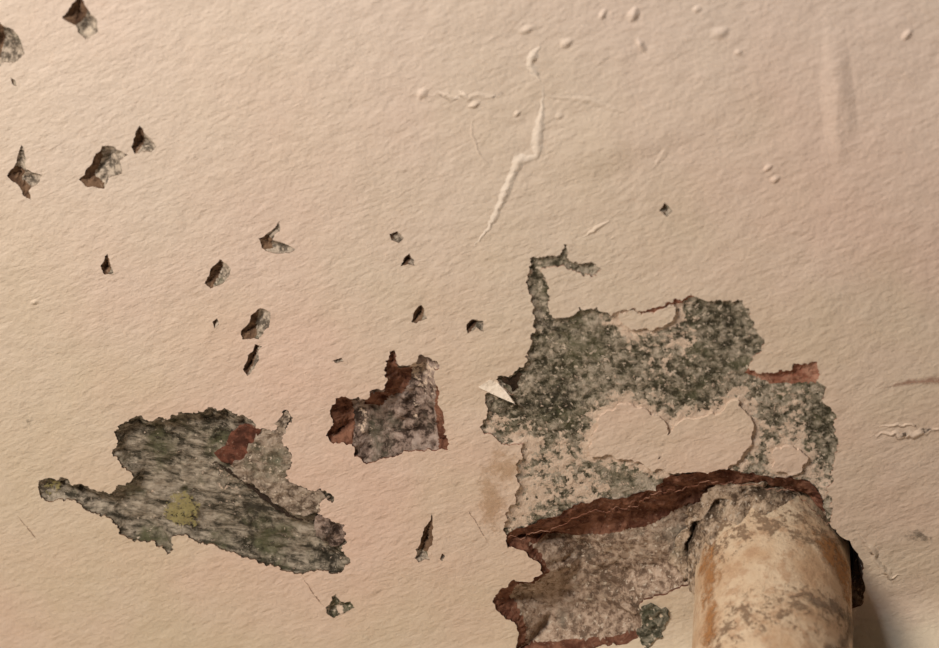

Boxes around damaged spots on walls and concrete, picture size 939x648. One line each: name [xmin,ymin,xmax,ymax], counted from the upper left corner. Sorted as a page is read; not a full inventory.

flaking render [0,23,25,65]
flaking render [62,0,98,39]
flaking render [7,145,42,199]
flaking render [79,126,156,189]
flaking render [205,260,231,288]
flaking render [241,308,271,376]
flaking render [326,350,449,464]
peeling [479,244,839,648]
flaking render [38,407,350,575]
flaking render [415,515,445,562]
flaking render [849,531,905,608]